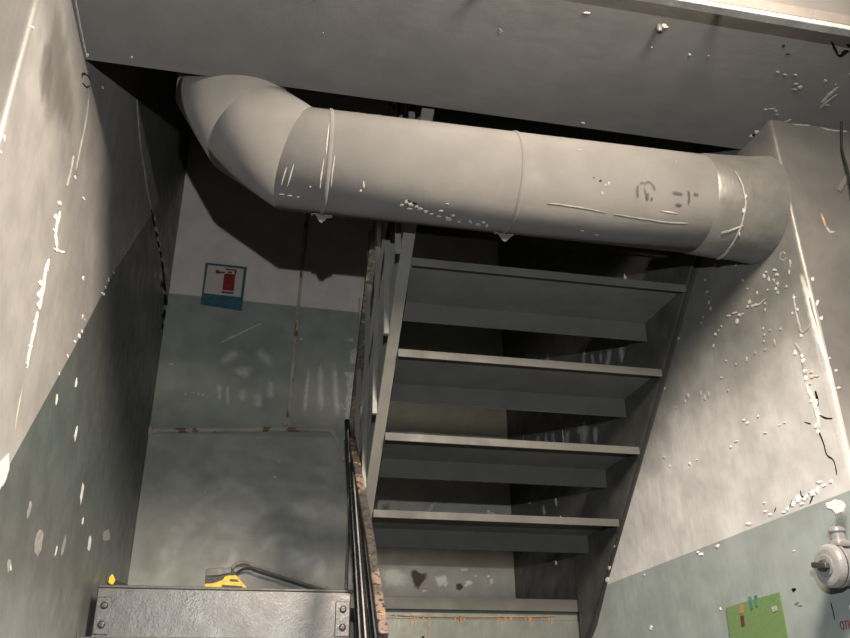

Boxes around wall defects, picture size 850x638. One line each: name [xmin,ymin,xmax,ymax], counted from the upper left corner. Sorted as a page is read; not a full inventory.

peeling [67,101,89,186]
peeling [53,201,65,253]
peeling [26,259,50,369]
peeling [727,251,791,324]
crack [791,294,837,475]
flaking render [763,480,832,516]
spalling [826,500,846,515]
corrosion [389,614,553,638]